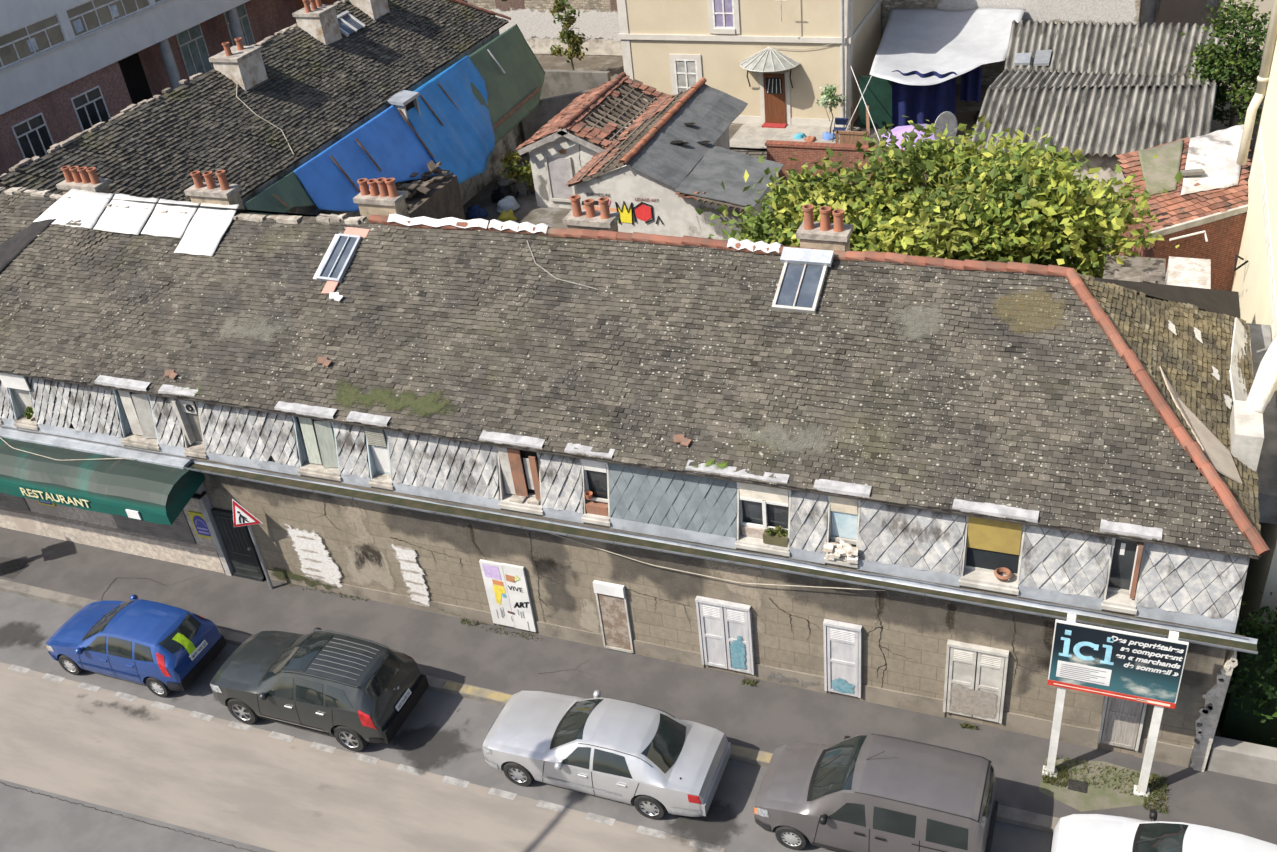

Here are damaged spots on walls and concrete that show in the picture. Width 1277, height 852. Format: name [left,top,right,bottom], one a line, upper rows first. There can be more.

water stain [344,503,382,568]
water stain [394,546,429,607]
crack [866,588,913,688]